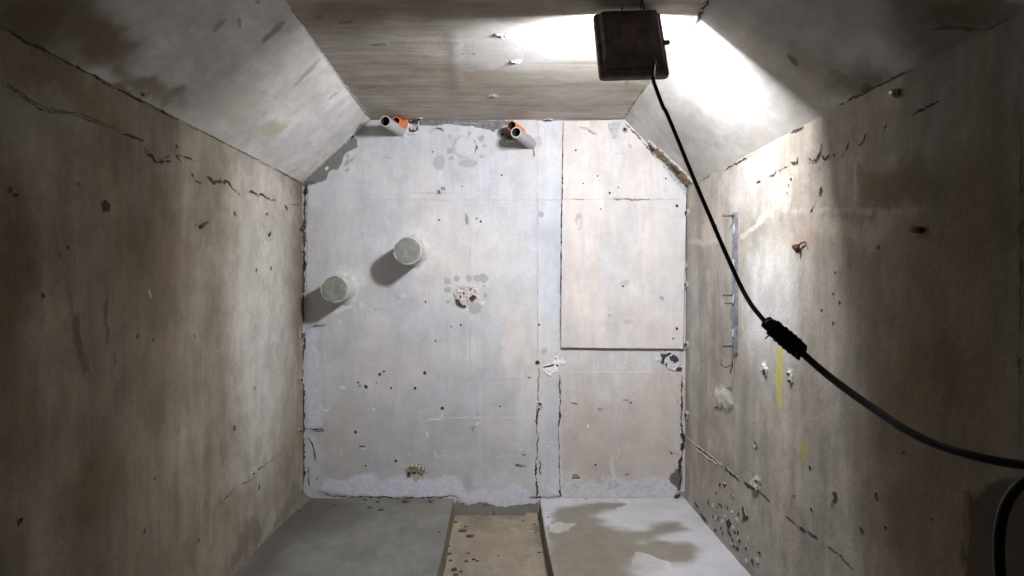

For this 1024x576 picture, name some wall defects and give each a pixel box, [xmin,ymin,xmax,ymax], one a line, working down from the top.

crack [912,97,947,116]
spalling [647,139,708,186]
crack [756,123,887,183]
rust [784,216,830,273]
spalling [453,283,486,308]
spalling [527,356,568,379]
spalling [654,340,690,372]
spalling [405,463,428,478]
damp [225,322,724,576]
crack [528,369,562,499]
crack [669,376,686,490]